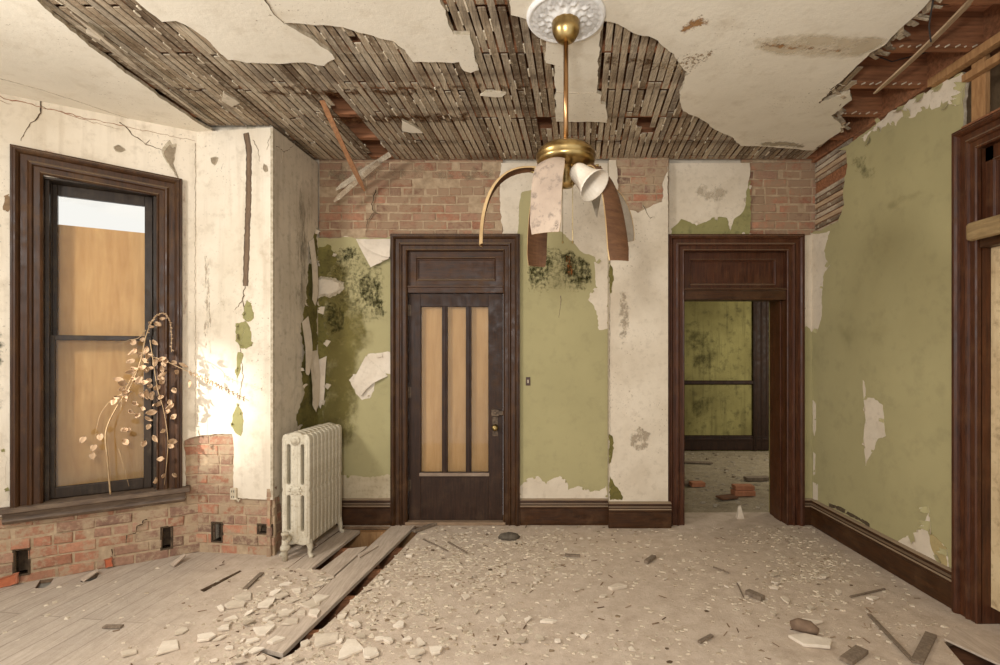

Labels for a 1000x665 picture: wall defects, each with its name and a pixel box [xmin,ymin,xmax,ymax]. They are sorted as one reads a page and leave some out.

peeling [862,73,966,146]
flaking render [609,157,669,213]
crack [0,78,196,421]
flaking render [296,159,503,430]
damp [530,253,591,289]
flaking render [668,159,830,334]
peeling [235,301,254,378]
damp [323,248,384,439]
peeling [862,381,886,463]
flaking render [0,403,282,588]
peeling [520,476,623,500]
peeling [898,506,949,567]